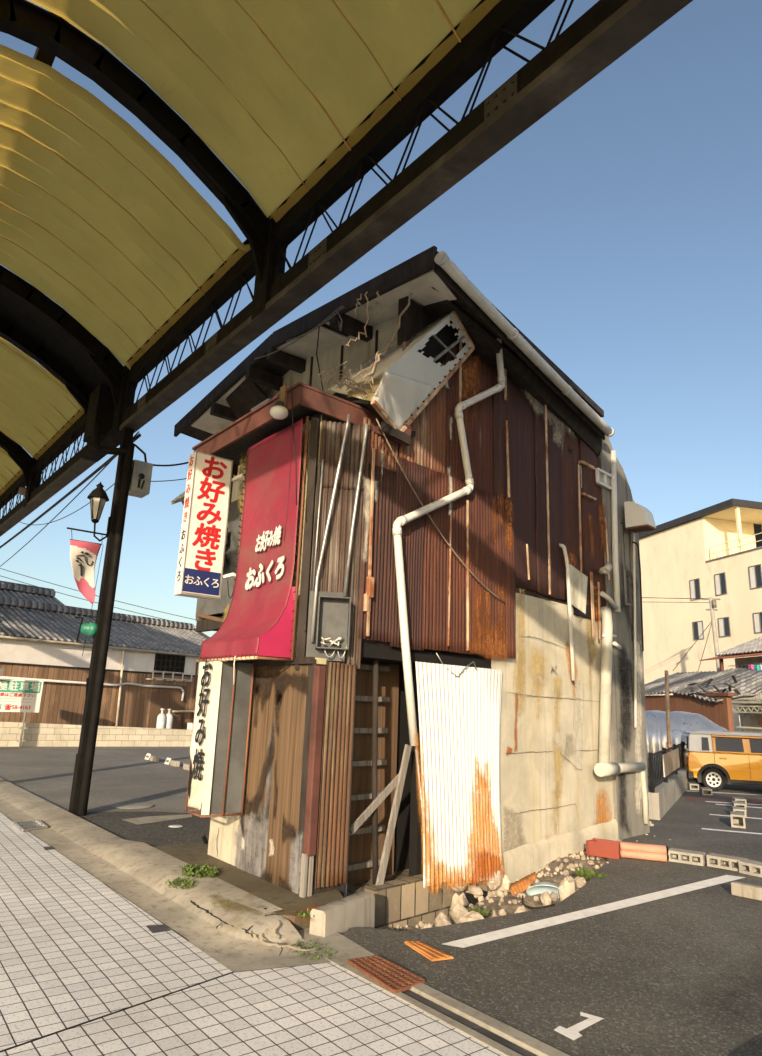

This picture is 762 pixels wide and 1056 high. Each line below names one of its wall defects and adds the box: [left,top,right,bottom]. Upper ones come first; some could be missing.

corrosion [493,495,512,551]
corrosion [471,588,507,659]
damp [622,565,637,627]
corrosion [507,693,518,755]
damp [620,641,642,832]
damp [235,672,307,894]
corrosion [419,760,504,890]
corrosion [597,795,609,824]